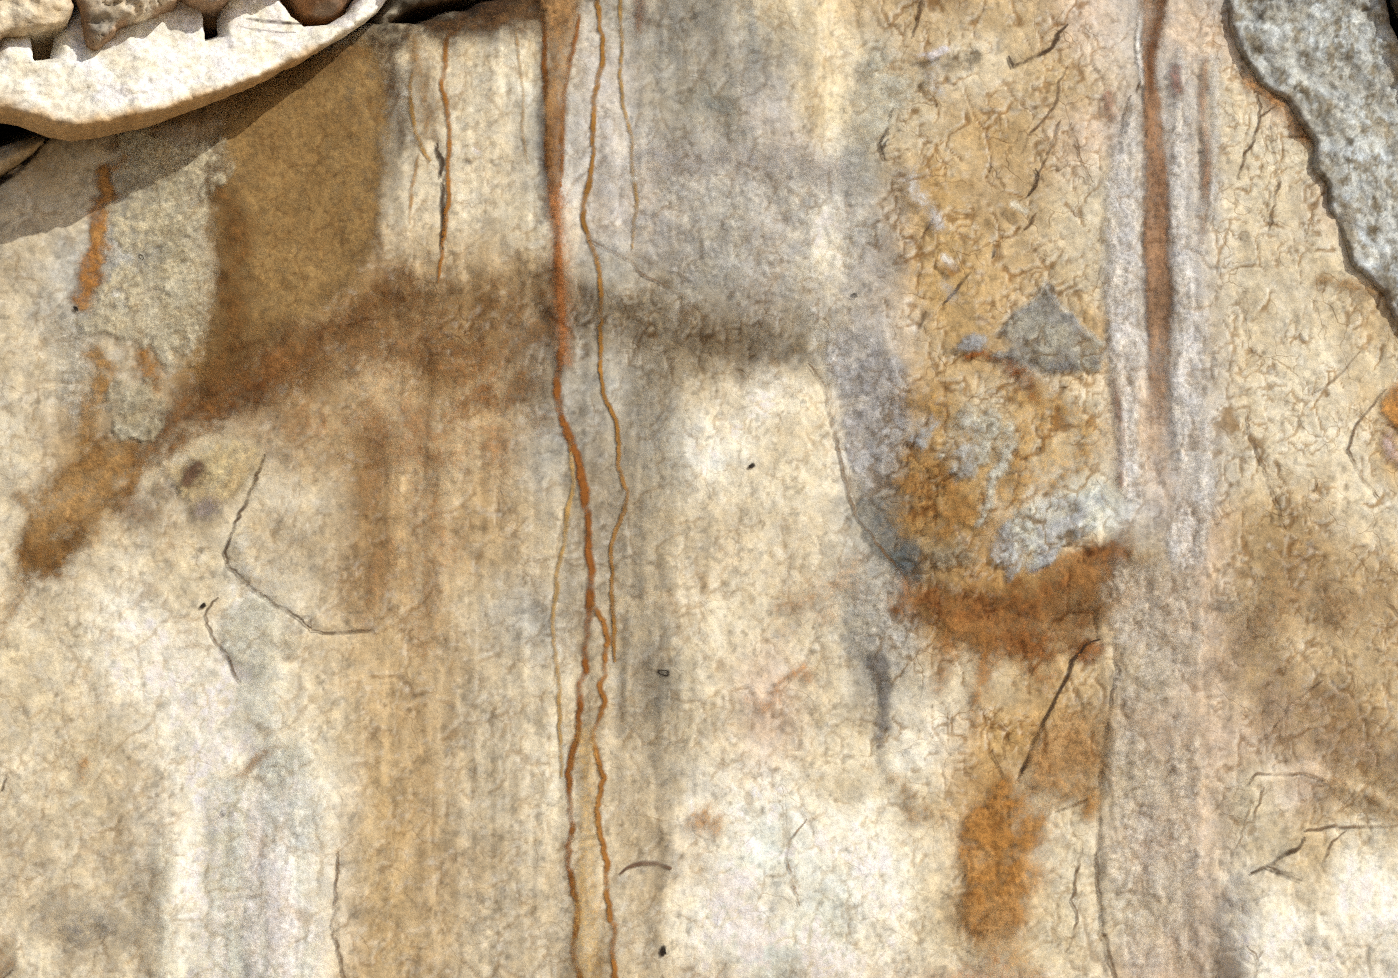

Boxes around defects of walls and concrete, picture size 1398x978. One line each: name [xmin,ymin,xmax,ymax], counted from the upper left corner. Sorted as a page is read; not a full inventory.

damp [60,34,435,415]
crack [1008,24,1083,230]
crack [1238,91,1281,228]
damp [107,378,166,441]
crack [205,454,371,688]
corrosion [10,0,639,978]
crack [808,363,911,597]
corrosion [891,350,1098,539]
corrosion [891,539,1134,703]
crack [332,851,346,978]
corrosion [959,713,1104,970]
crack [1239,772,1398,881]